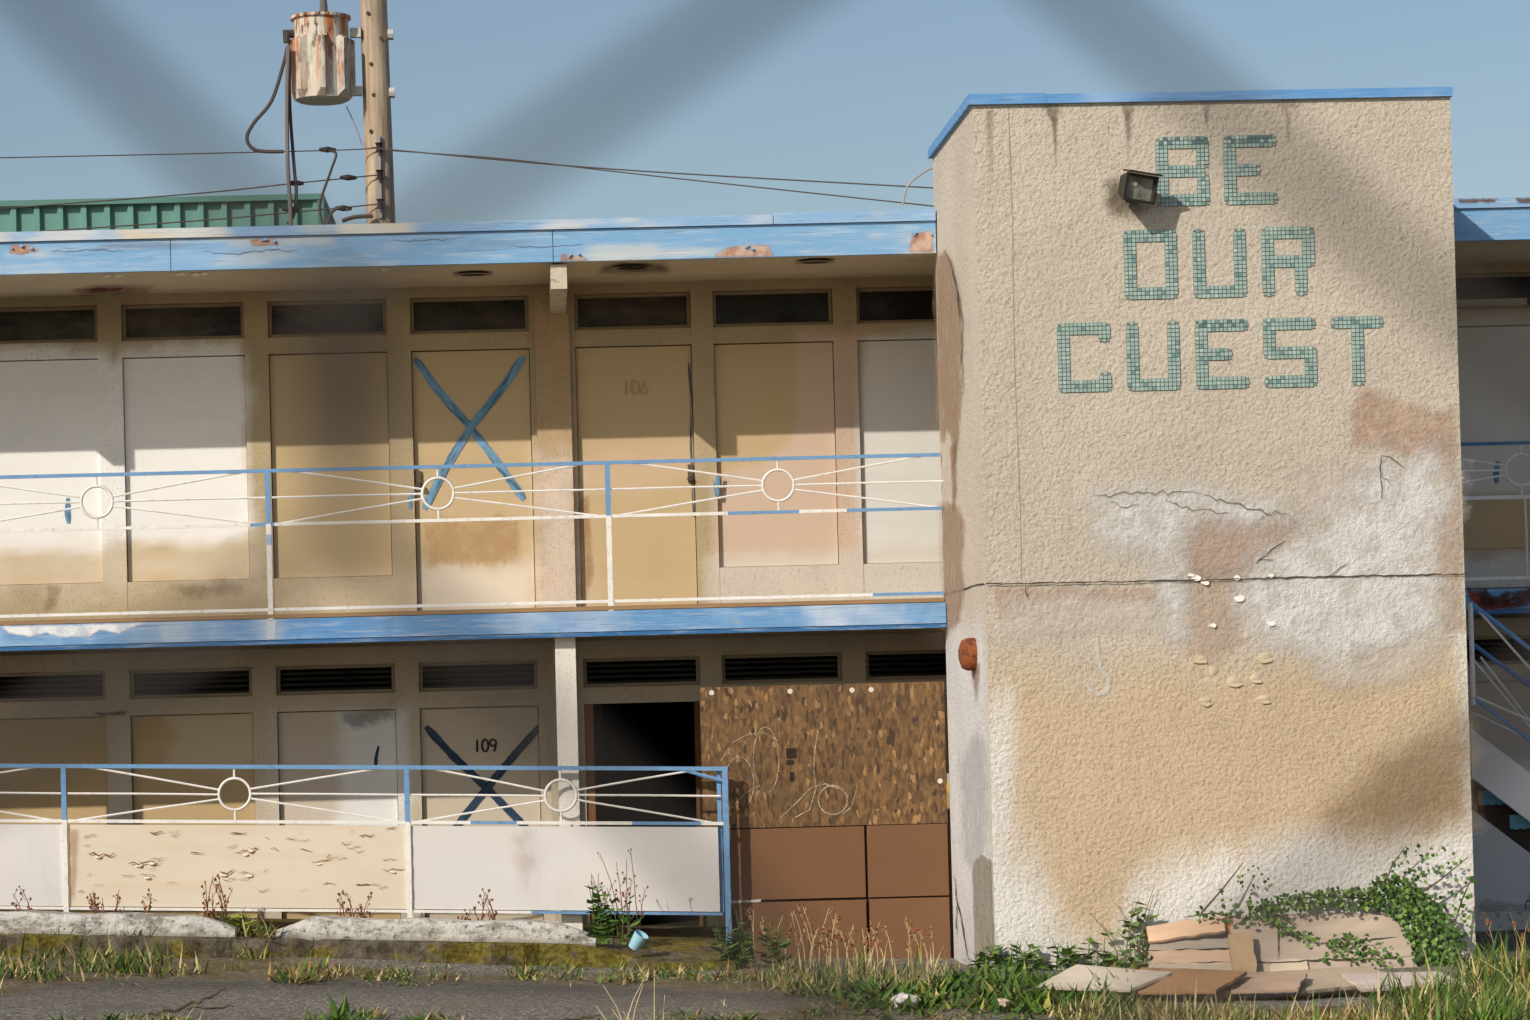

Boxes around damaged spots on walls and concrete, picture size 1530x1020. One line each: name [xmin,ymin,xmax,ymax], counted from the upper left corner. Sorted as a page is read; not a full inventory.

peeling [10,244,37,254]
peeling [717,245,772,257]
peeling [909,231,933,252]
crack [943,111,1465,598]
rust [1468,588,1530,610]